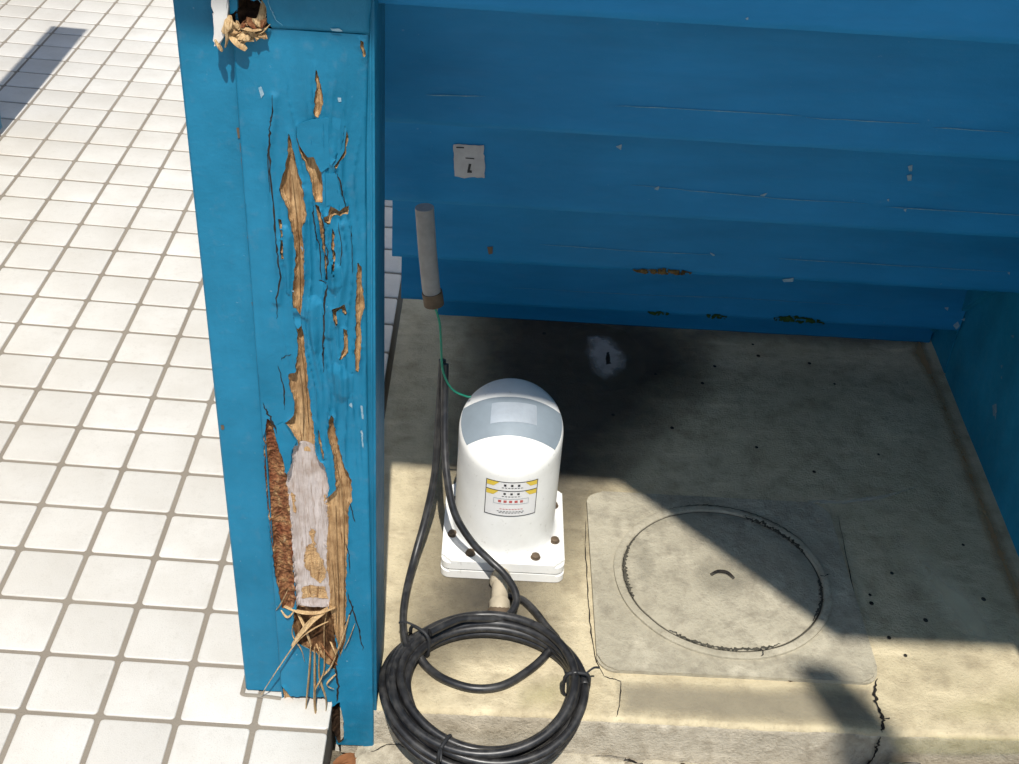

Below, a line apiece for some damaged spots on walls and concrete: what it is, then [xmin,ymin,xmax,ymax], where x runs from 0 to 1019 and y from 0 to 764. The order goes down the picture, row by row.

peeling [296,70,349,271]
peeling [333,263,365,371]
peeling [276,422,296,474]
spalling [261,590,355,714]
crack [867,678,890,764]